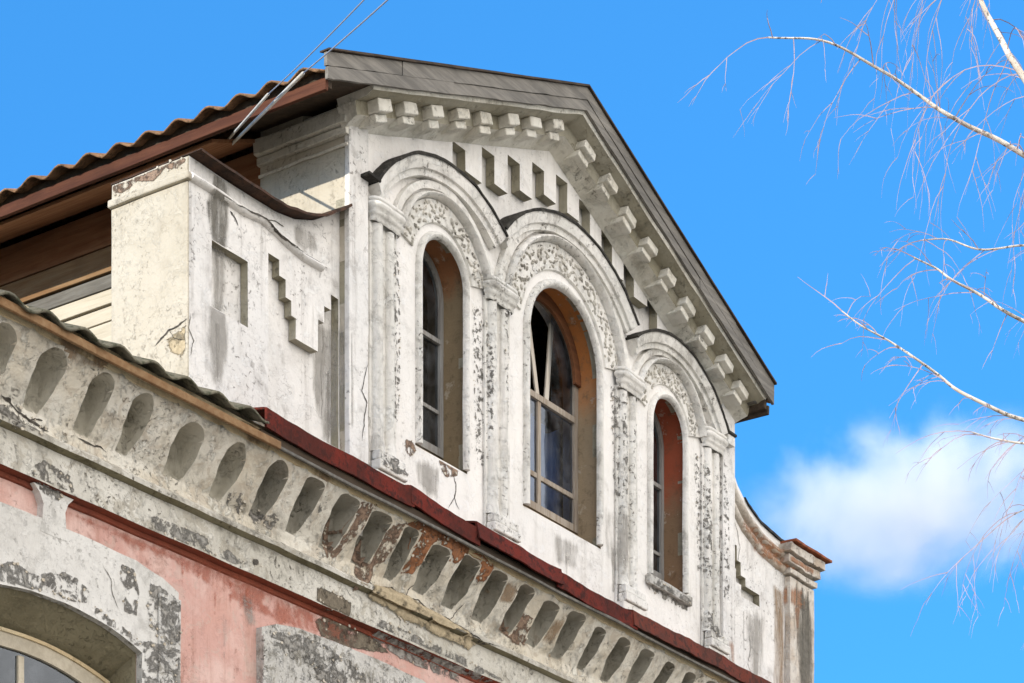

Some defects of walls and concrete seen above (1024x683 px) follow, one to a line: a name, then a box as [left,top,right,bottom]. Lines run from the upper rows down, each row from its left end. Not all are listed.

flaking render [113,157,185,196]
crack [231,204,327,268]
crack [155,314,194,353]
crack [362,366,371,440]
flaking render [472,307,510,466]
flaking render [610,386,629,497]
flaking render [694,454,730,600]
flaking render [0,561,182,683]
flaking render [270,495,502,683]
damp [775,588,783,683]
damp [796,584,812,683]